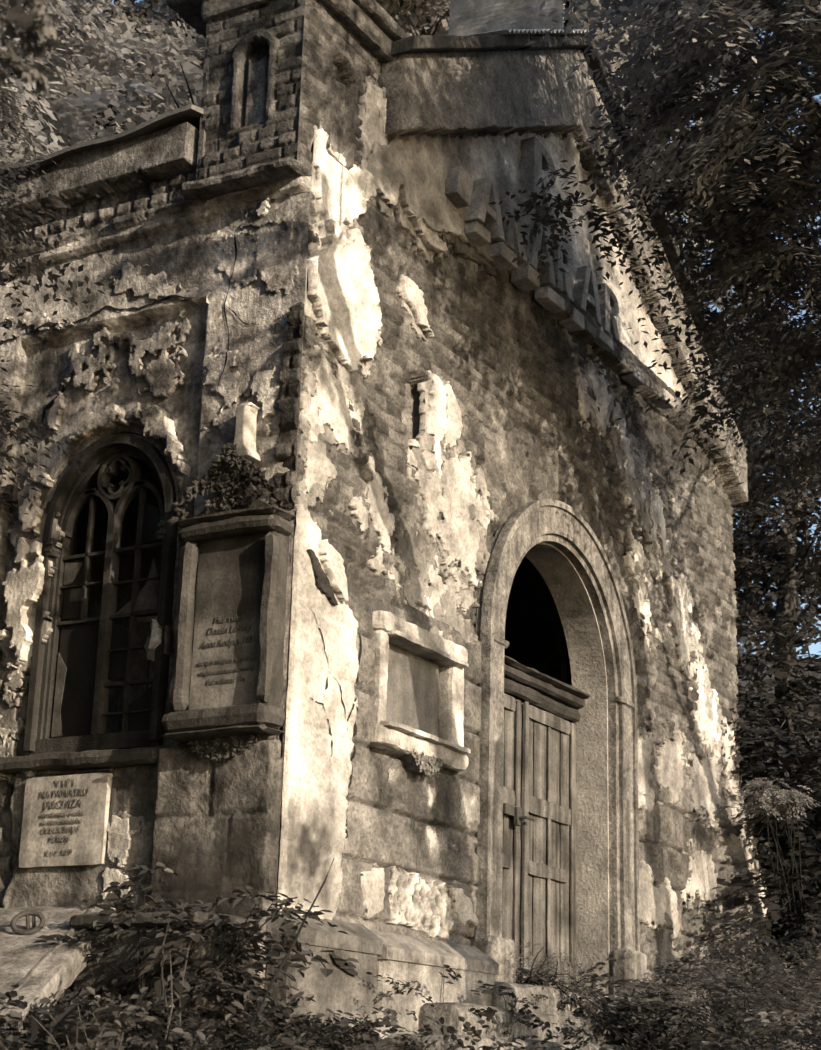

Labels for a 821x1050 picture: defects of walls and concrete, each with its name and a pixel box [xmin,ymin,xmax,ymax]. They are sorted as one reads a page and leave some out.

flaking render [4,313,74,331]
crack [0,295,198,345]
crack [217,220,259,391]
flaking render [0,774,16,908]
peeling [0,464,65,757]
crack [311,609,362,866]
flaking render [60,73,697,920]
flaking render [562,328,772,955]